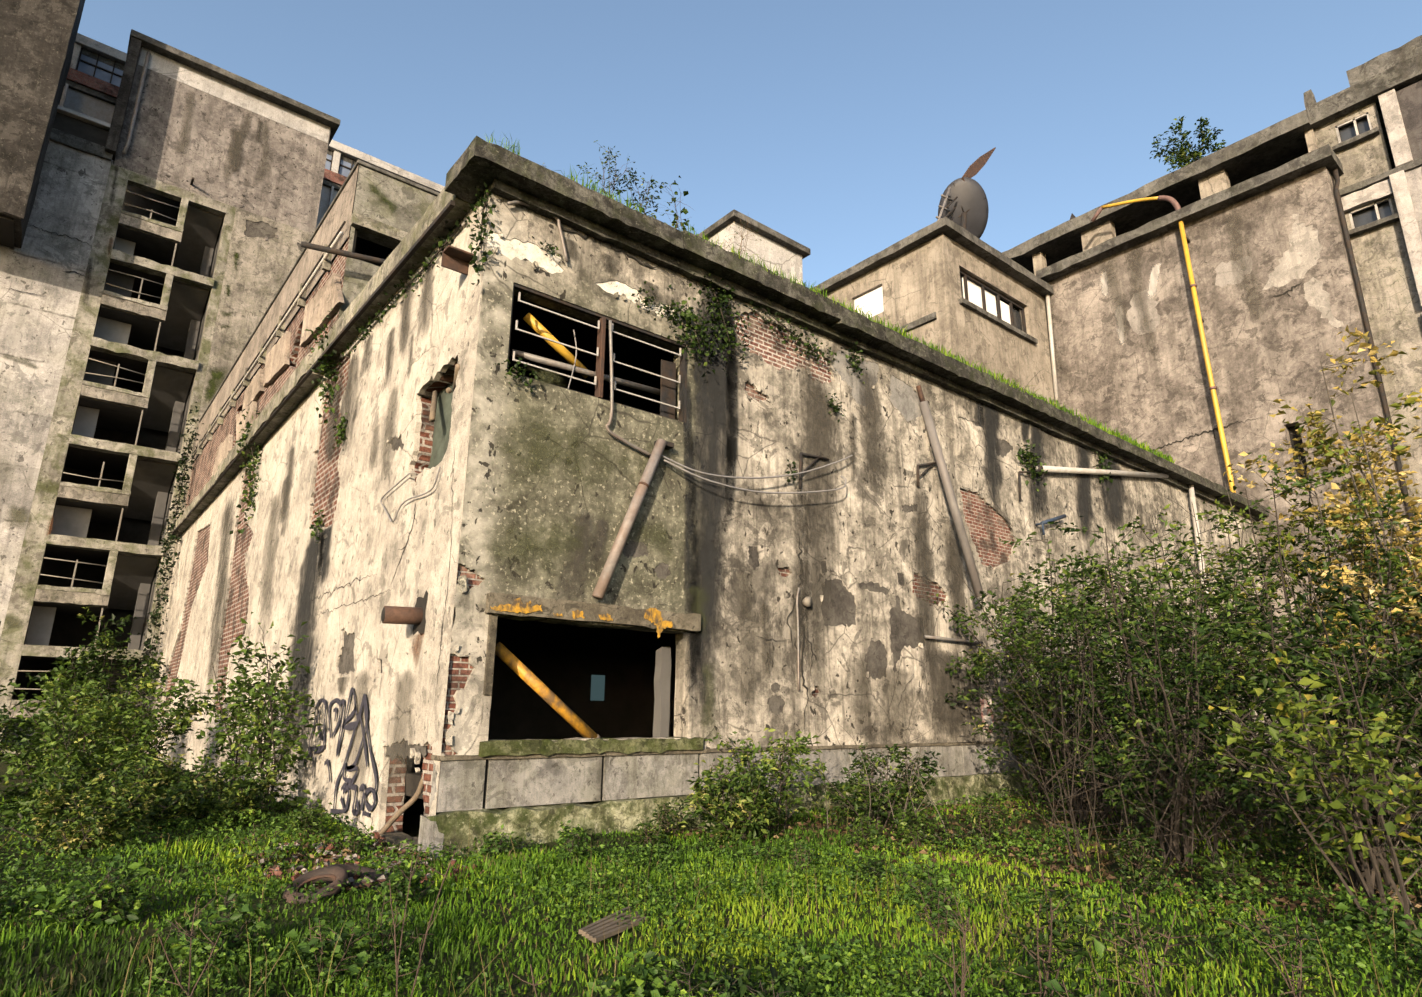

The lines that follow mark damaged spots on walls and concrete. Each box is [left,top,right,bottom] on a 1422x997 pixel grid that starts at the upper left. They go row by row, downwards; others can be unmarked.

peeling [486,229,564,274]
flaking render [166,522,210,703]
flaking render [215,466,255,713]
flaking render [309,353,350,527]
spalling [387,360,458,485]
water stain [681,284,738,709]
flaking render [732,307,922,422]
flaking render [960,489,1014,570]
flaking render [381,645,473,816]